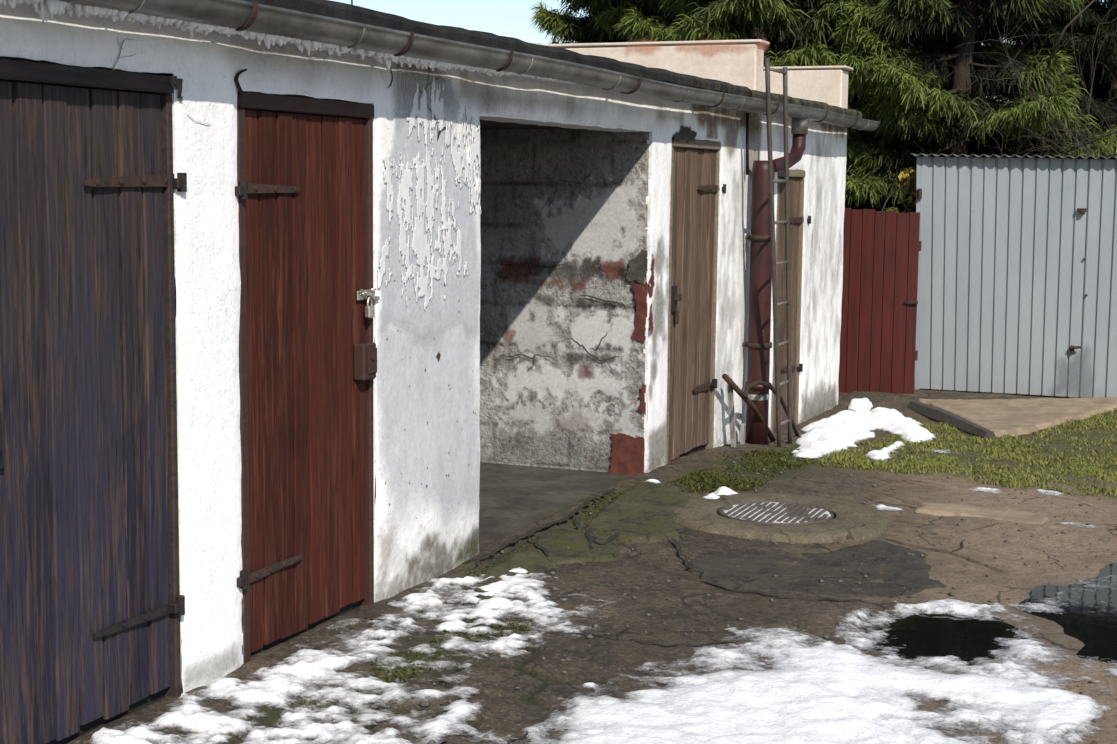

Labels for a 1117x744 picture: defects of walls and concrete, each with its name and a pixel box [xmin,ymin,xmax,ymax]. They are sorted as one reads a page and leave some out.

peeling [377,64,481,506]
peeling [493,243,668,415]
flaking render [609,433,645,475]
water stain [409,536,451,578]